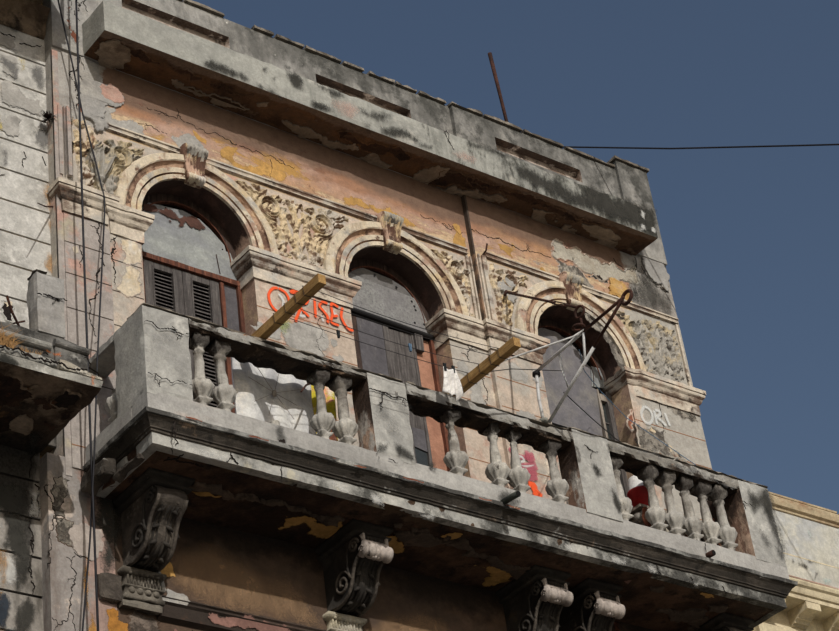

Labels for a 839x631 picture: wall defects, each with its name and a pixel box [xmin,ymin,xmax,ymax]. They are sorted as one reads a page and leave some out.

flaking render [79,39,269,135]
damp [471,143,657,234]
crack [420,214,548,257]
flaking render [411,165,641,302]
crack [144,320,191,339]
crack [148,372,194,387]
damp [3,493,38,583]
crack [28,455,91,631]
damp [749,489,811,568]
damp [16,597,35,631]
spalling [148,562,190,605]
peeling [208,613,290,631]